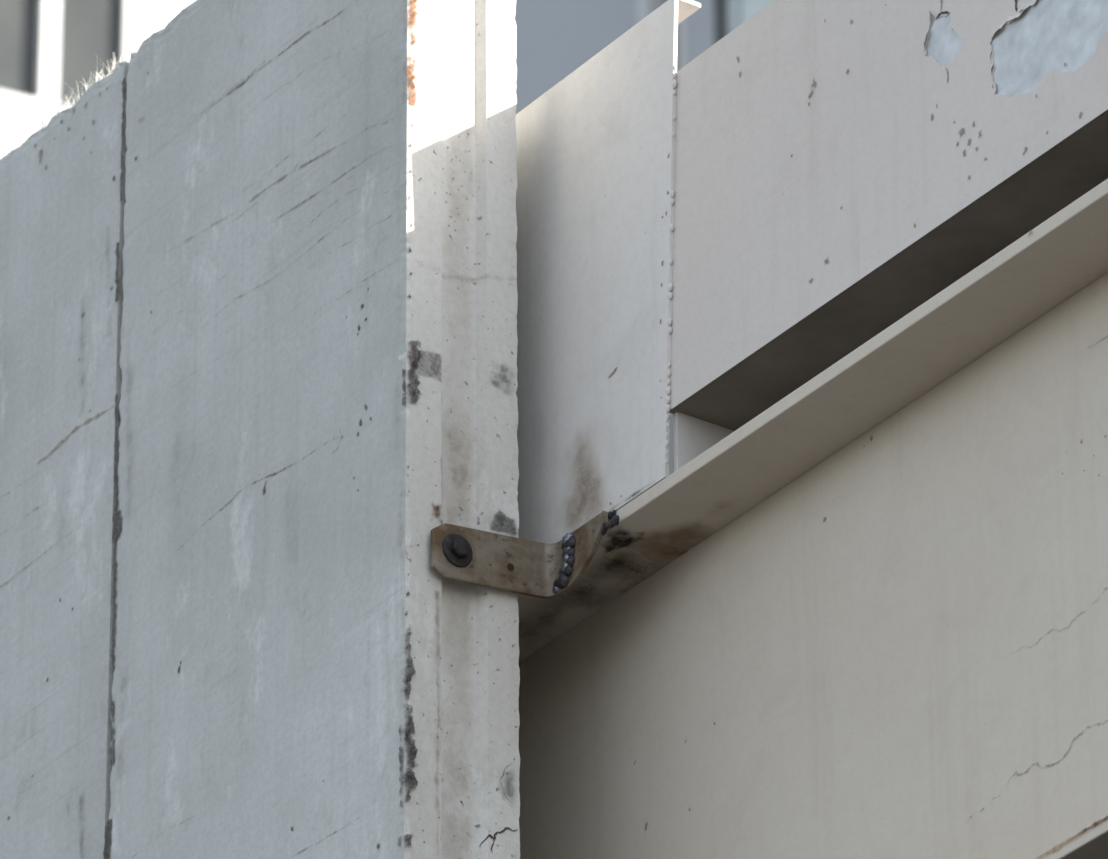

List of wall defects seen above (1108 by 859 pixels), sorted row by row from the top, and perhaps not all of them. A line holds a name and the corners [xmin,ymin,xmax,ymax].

corrosion [409,0,418,43]
peeling [923,0,964,82]
peeling [989,0,1108,97]
corrosion [407,55,417,106]
crack [480,827,518,853]